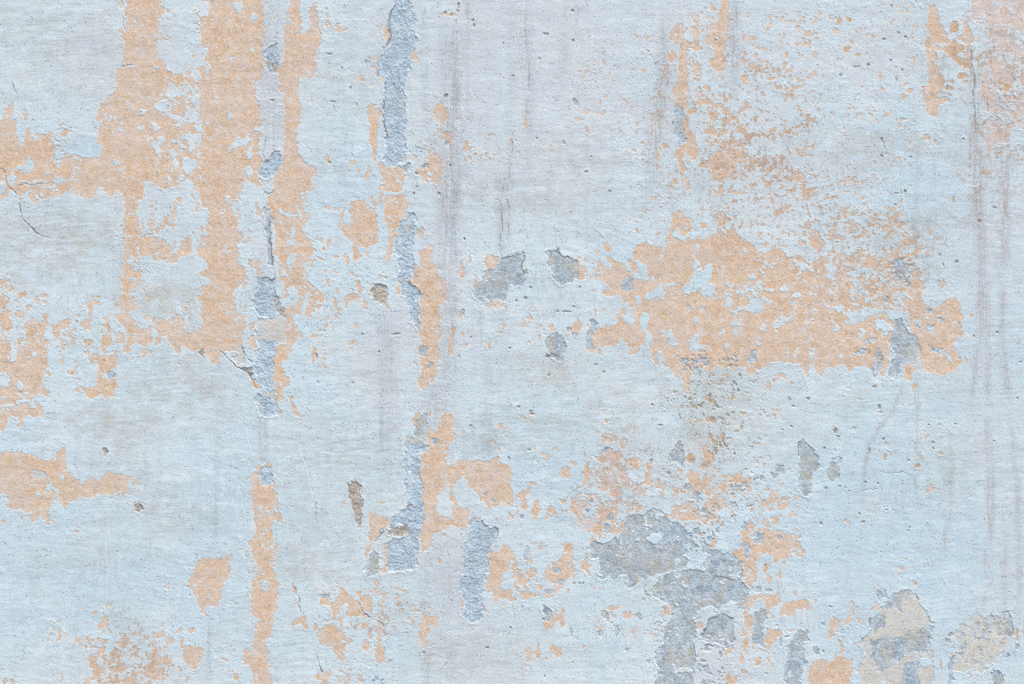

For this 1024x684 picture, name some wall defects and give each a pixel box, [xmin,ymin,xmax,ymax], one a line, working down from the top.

crack [0,168,43,237]
peeling [0,0,519,432]
peeling [419,0,1024,684]
peeling [0,447,148,538]
peeling [47,599,203,684]
peeling [163,450,440,684]